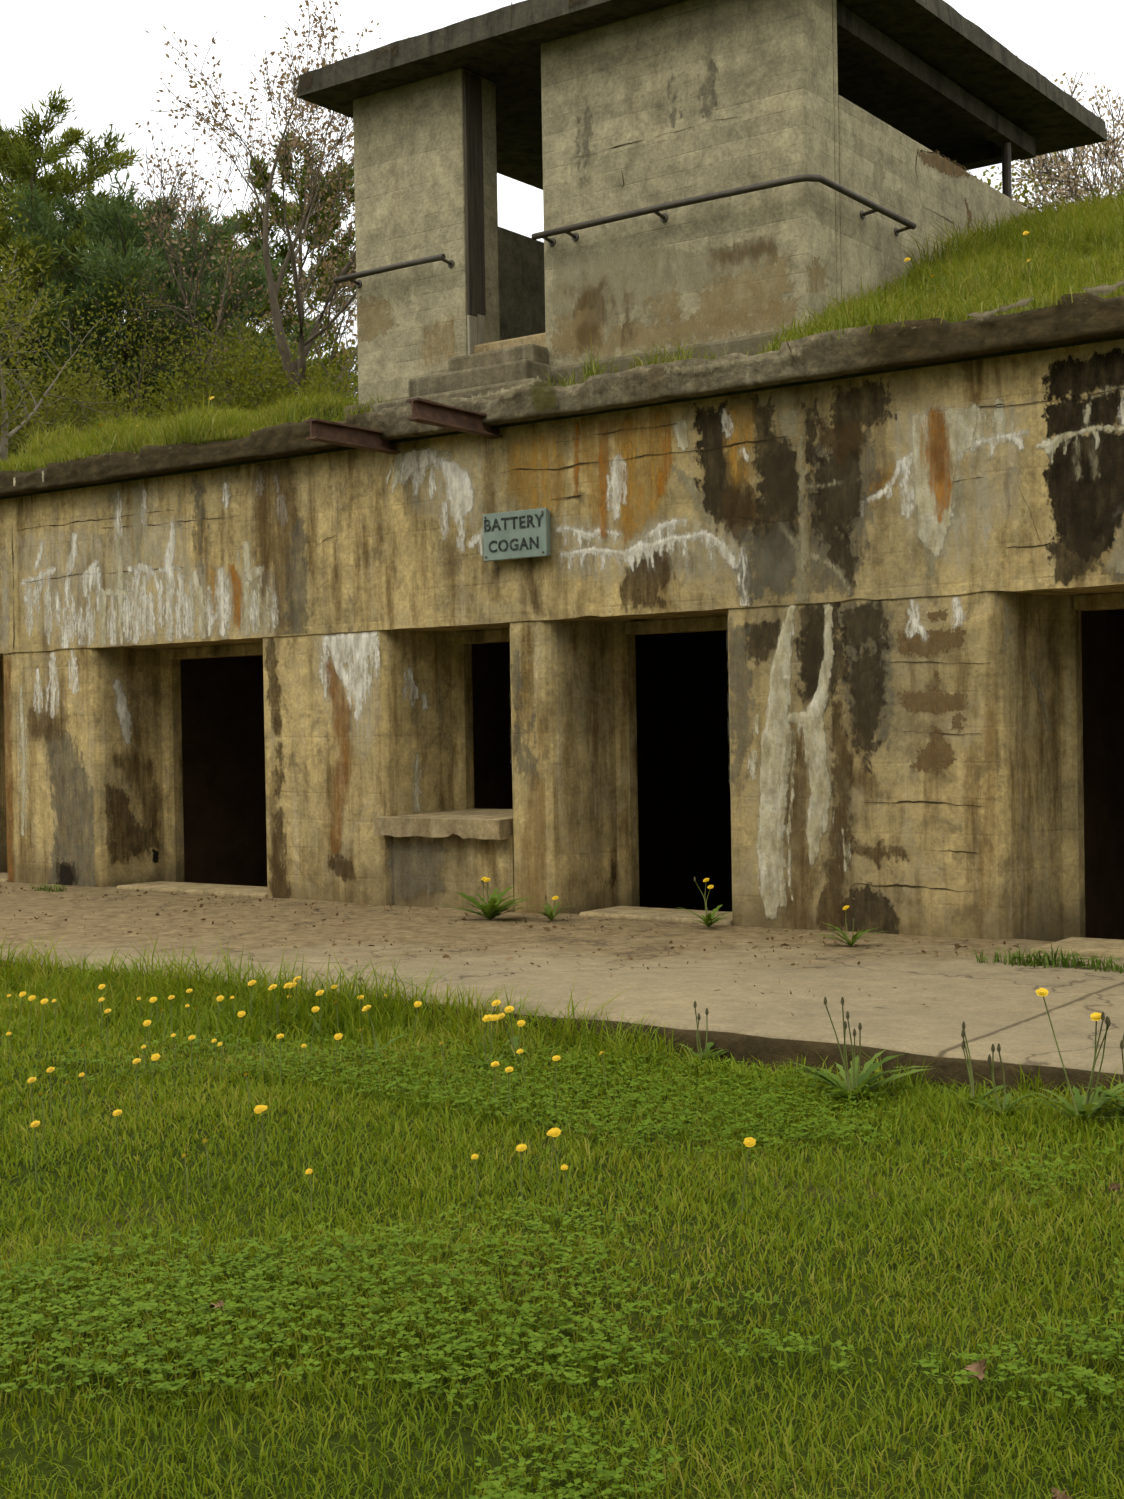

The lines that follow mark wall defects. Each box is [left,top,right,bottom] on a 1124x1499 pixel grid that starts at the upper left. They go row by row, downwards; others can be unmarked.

corrosion [508,410,671,541]
corrosion [911,405,977,556]
damp [1036,348,1124,586]
damp [18,460,313,898]
damp [319,632,380,721]
damp [556,376,926,934]
damp [952,597,965,627]
corrosion [327,663,349,853]
damp [328,854,356,882]